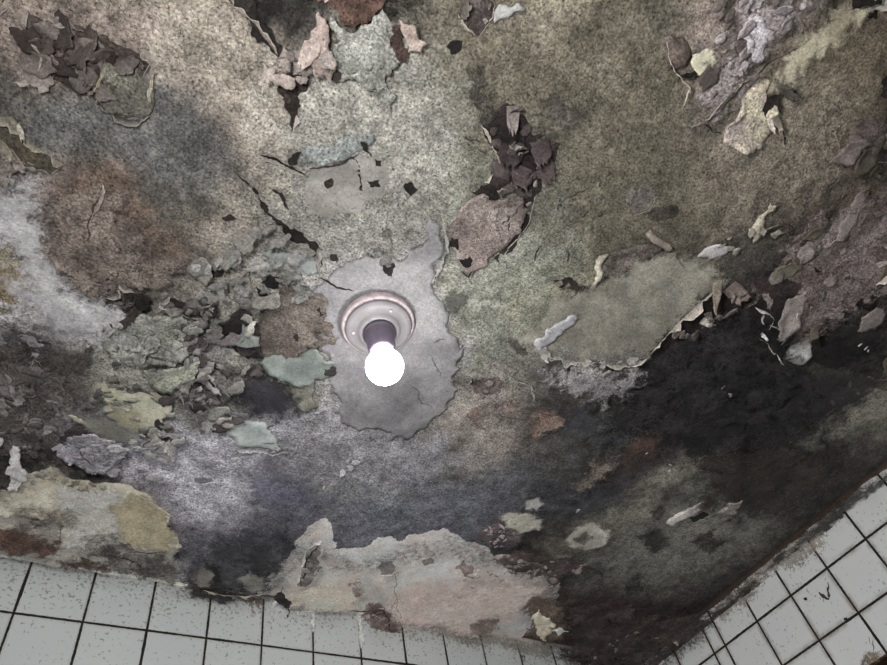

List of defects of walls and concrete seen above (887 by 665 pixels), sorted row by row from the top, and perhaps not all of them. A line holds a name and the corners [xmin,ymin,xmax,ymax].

peeling [8,9,156,127]
peeling [677,0,829,155]
water stain [0,177,126,375]
peeling [0,103,560,584]
peeling [507,76,887,395]
water stain [531,309,887,524]
peeling [252,515,603,645]
water stain [401,470,887,665]